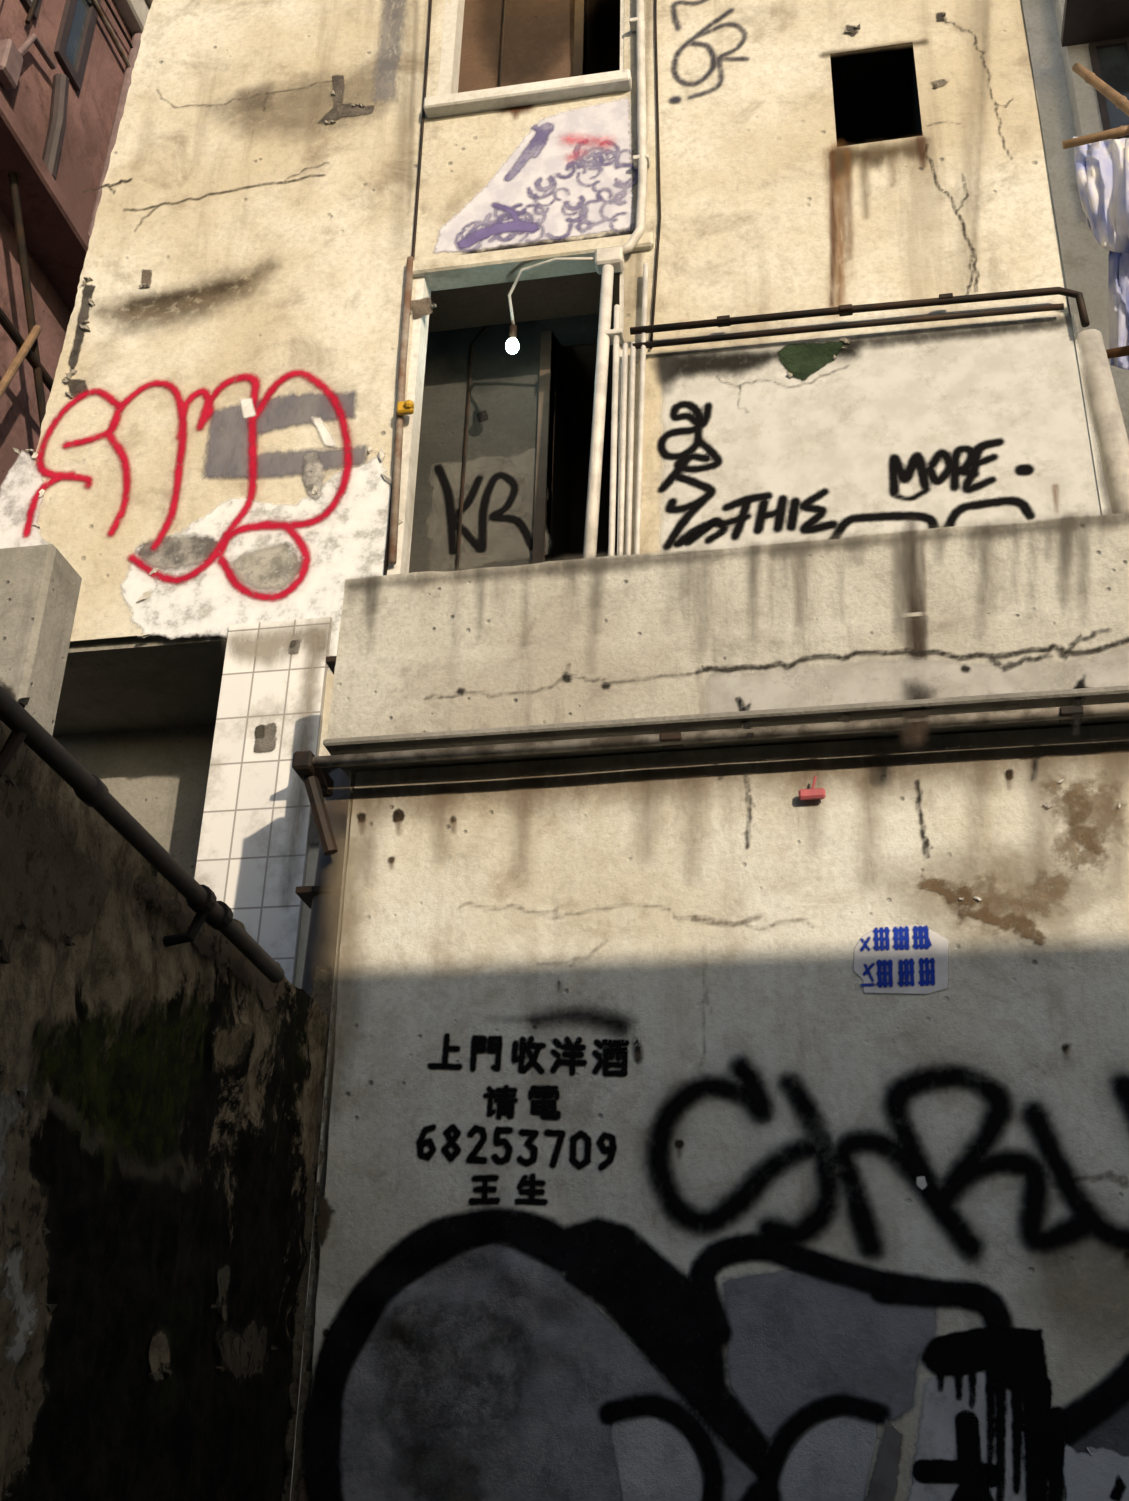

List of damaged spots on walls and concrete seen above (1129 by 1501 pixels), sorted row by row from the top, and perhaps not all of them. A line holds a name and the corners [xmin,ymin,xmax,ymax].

crack [83,162,325,224]
corrosion [831,147,849,307]
crack [925,145,979,294]
water stain [108,272,259,323]
peeling [0,448,49,549]
peeling [121,447,403,670]
peeling [427,448,551,572]
water stain [537,556,695,573]
water stain [771,540,863,554]
water stain [906,520,930,661]
water stain [977,524,1017,536]
crack [697,629,1129,739]